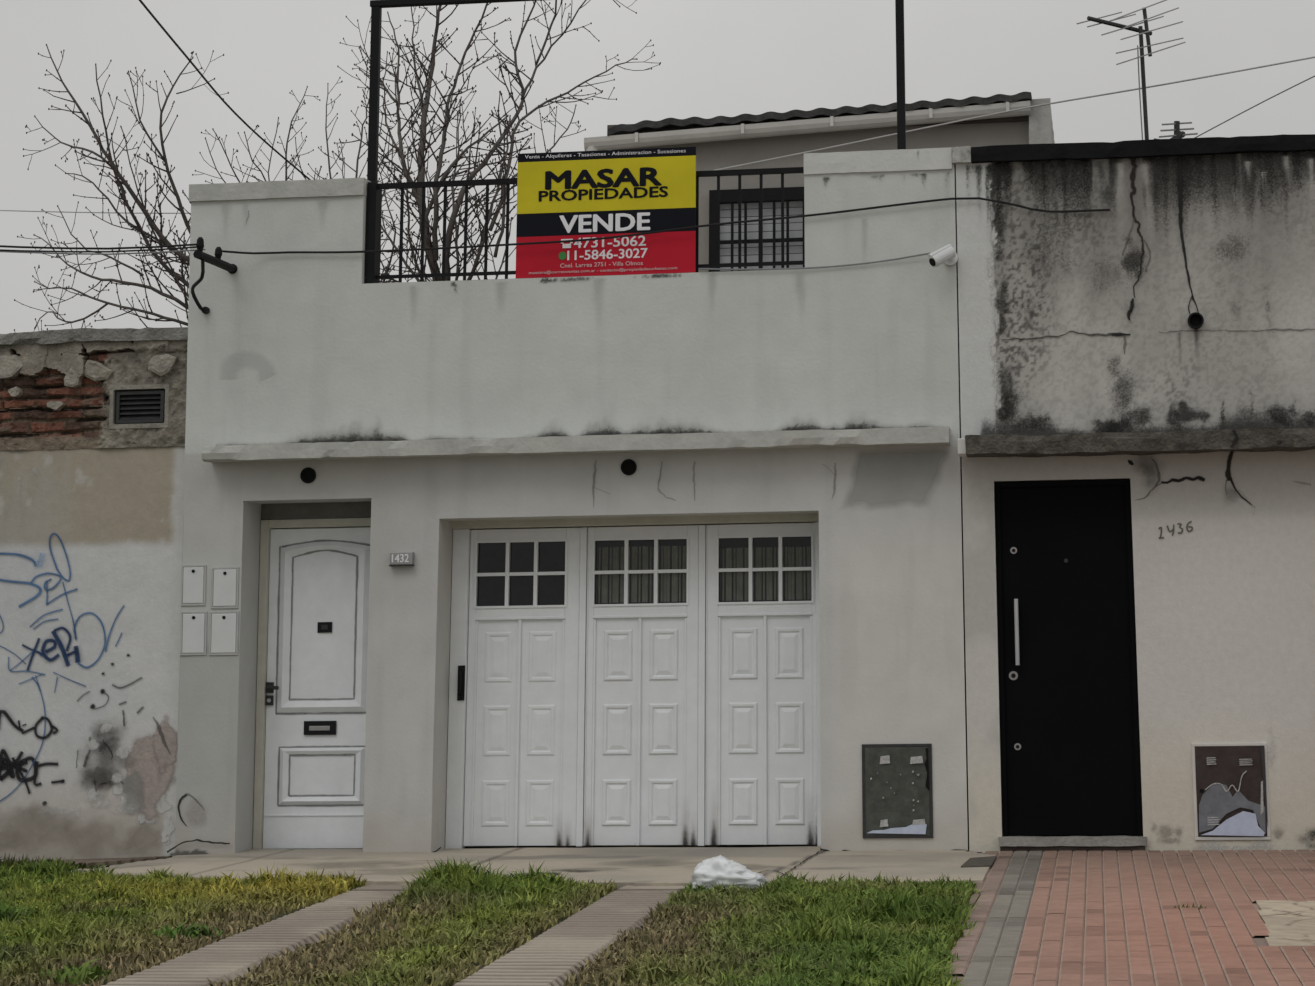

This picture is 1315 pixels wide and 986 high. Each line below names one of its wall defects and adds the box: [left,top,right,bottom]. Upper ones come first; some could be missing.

water stain [996,282,1008,331]
water stain [967,159,1092,252]
crack [1002,158,1315,354]
water stain [1107,151,1315,314]
crack [1137,430,1255,510]
peeling [113,717,230,857]